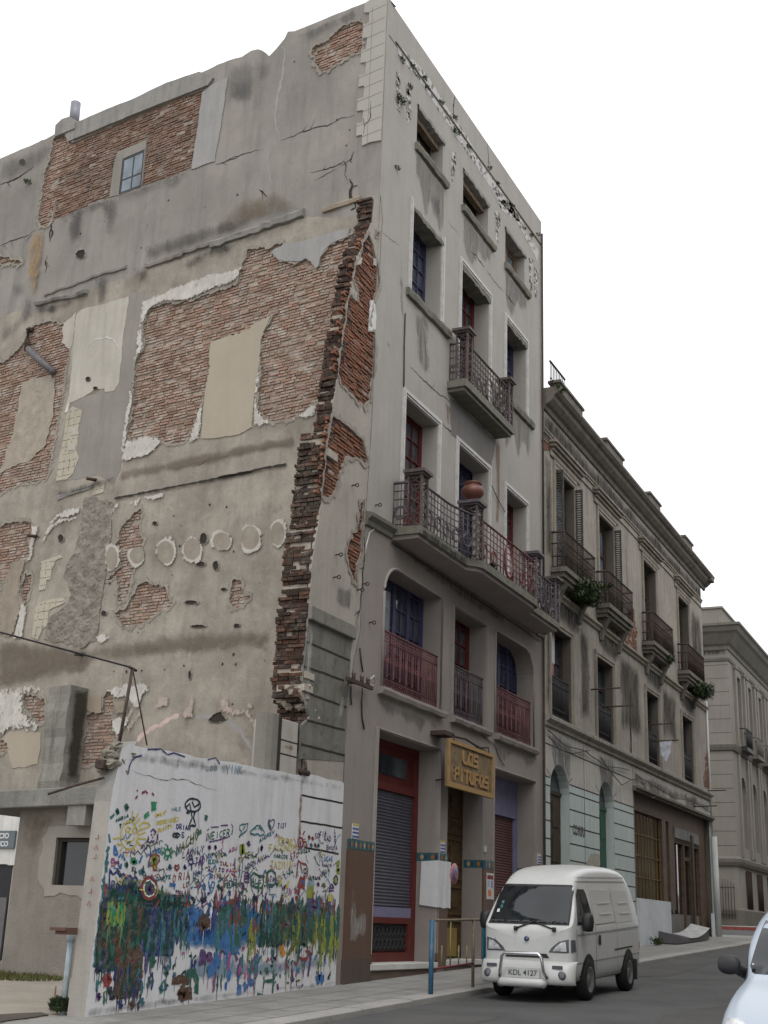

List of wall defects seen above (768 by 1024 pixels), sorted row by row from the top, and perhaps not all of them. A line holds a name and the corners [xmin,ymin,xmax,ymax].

flaking render [307,17,366,75]
flaking render [35,135,76,229]
crack [283,100,371,210]
peeling [396,46,539,298]
flaking render [0,318,70,497]
flaking render [121,228,382,503]
spalling [0,493,200,648]
peeling [0,685,47,757]
flaking render [48,670,148,795]